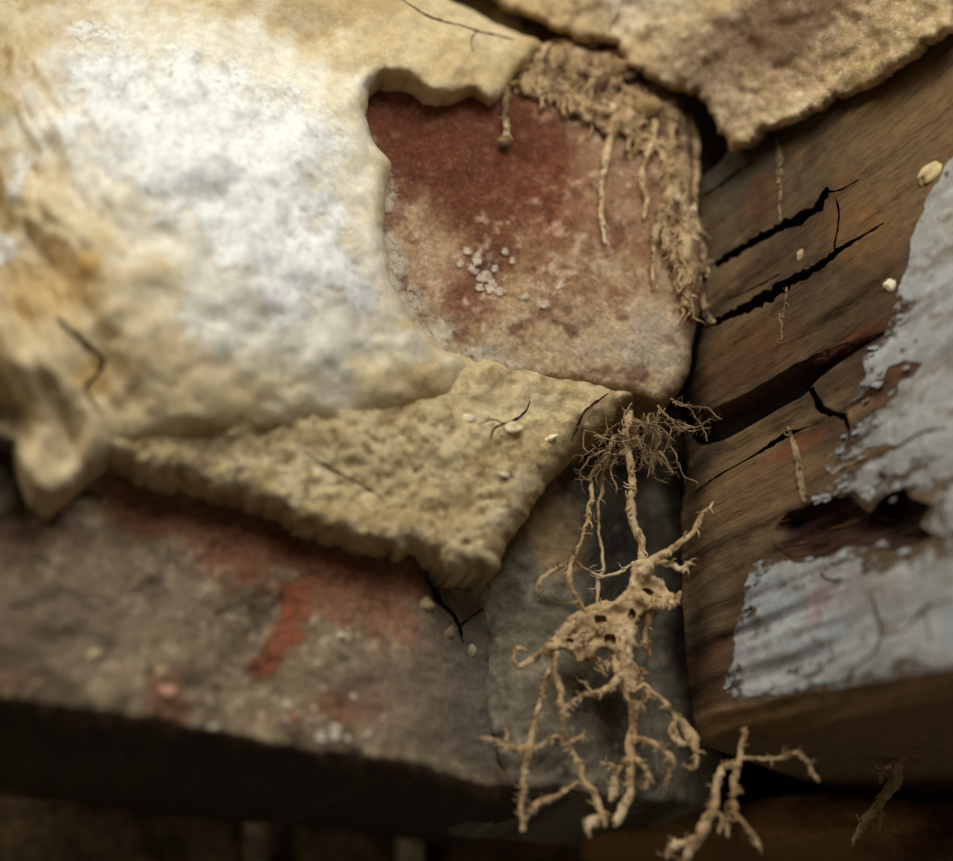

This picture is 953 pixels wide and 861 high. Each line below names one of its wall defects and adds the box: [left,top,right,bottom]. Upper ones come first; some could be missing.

crack [403,0,514,51]
crack [713,179,884,326]
crack [682,331,886,494]
crack [852,427,947,467]
crack [421,568,484,643]